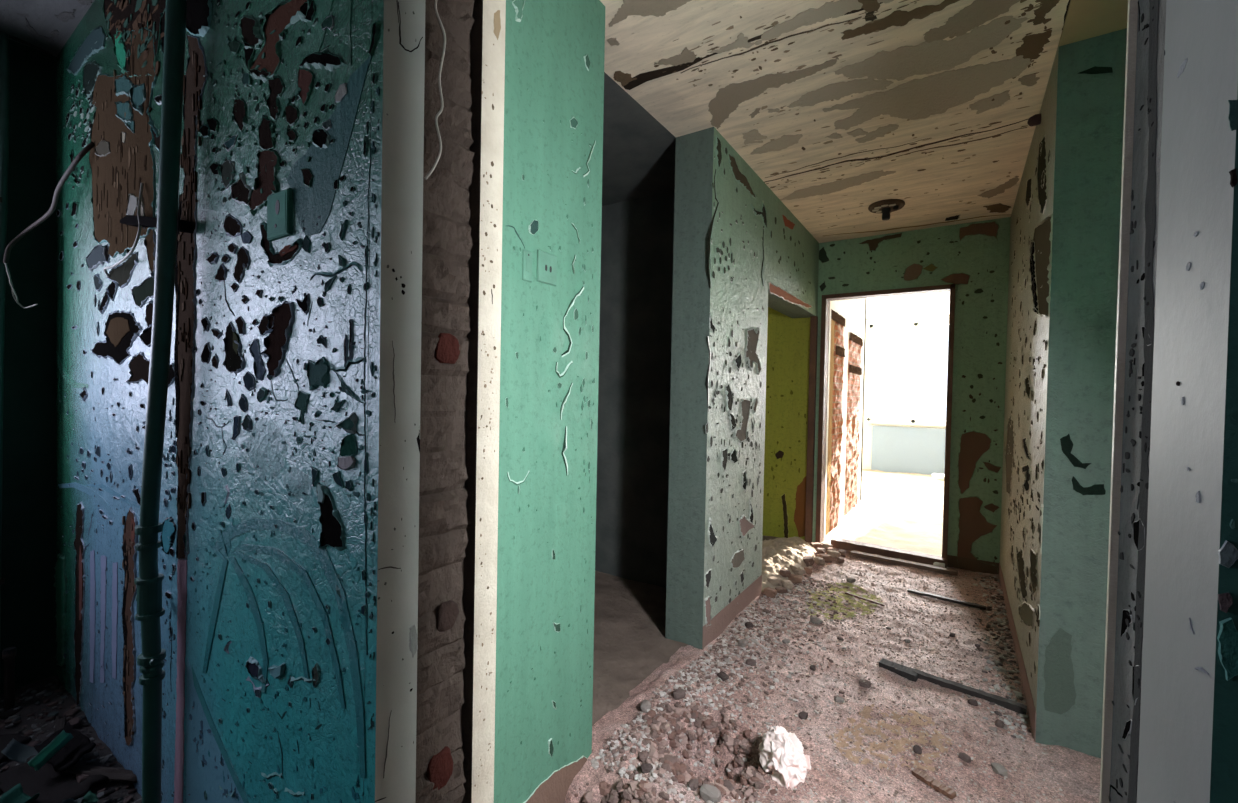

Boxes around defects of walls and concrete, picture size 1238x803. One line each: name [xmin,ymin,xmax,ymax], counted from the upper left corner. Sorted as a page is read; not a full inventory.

peeling [368,21,380,58]
peeling [607,0,692,47]
peeling [613,71,637,87]
peeling [654,0,1060,267]
flaking render [55,0,166,416]
peeling [528,220,539,235]
flaking render [160,0,369,599]
flaking render [769,282,812,308]
flaking render [945,134,1053,647]
peeling [704,312,762,627]
peeling [781,493,789,538]
spalling [764,542,846,598]